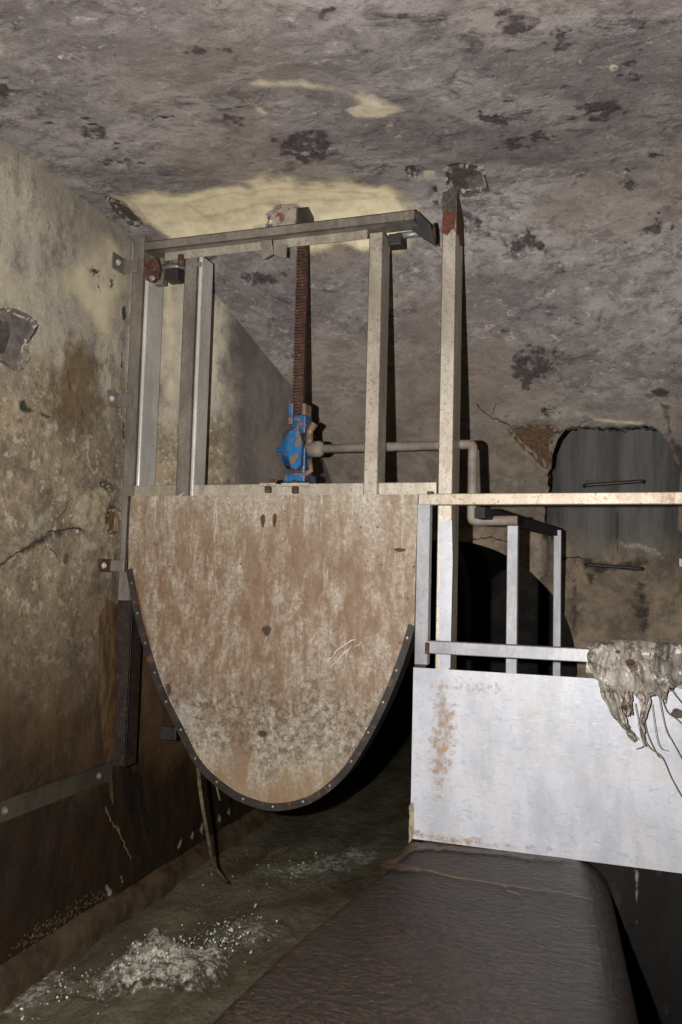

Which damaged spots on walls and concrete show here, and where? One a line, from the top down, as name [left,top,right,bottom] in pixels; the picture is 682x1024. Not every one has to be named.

mould [272,130,336,164]
spalling [443,163,489,201]
spalling [102,195,145,227]
mould [504,229,545,258]
spalling [0,304,39,373]
water stain [20,343,105,430]
mould [512,344,563,391]
crack [475,403,512,428]
spalling [508,423,563,469]
crack [0,500,82,566]
rust [432,699,453,773]
crack [106,808,131,859]